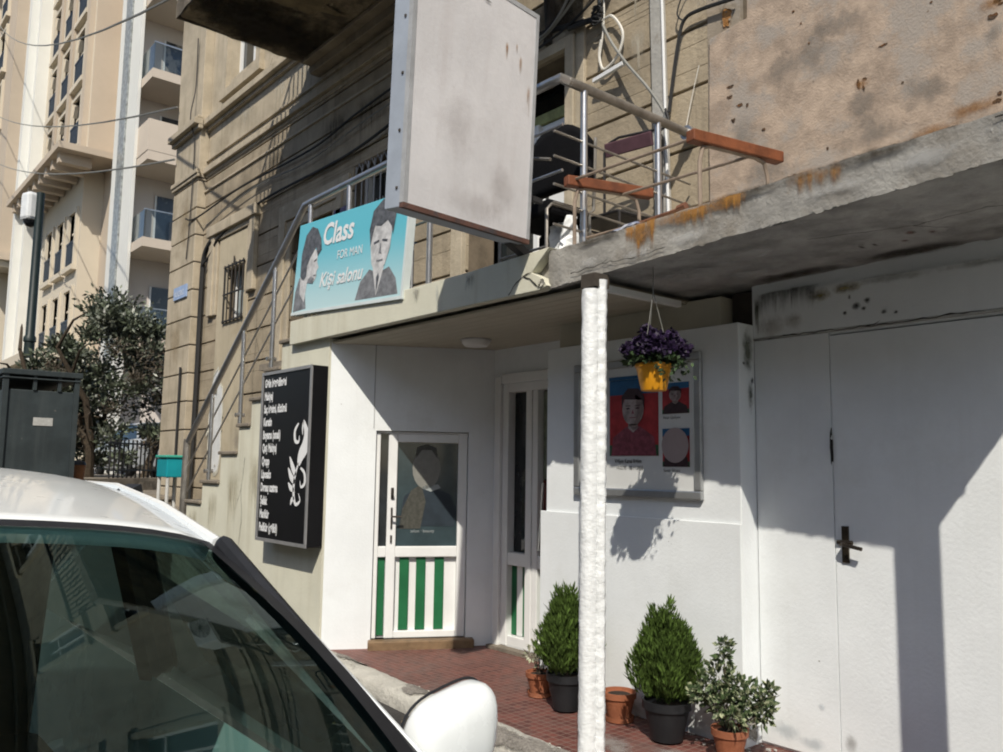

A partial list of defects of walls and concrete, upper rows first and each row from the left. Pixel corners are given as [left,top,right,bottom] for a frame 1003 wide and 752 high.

leakage [200,0,329,75]
rust [721,7,733,28]
rust [626,193,741,250]
leakage [874,243,952,259]
leakage [742,268,830,320]